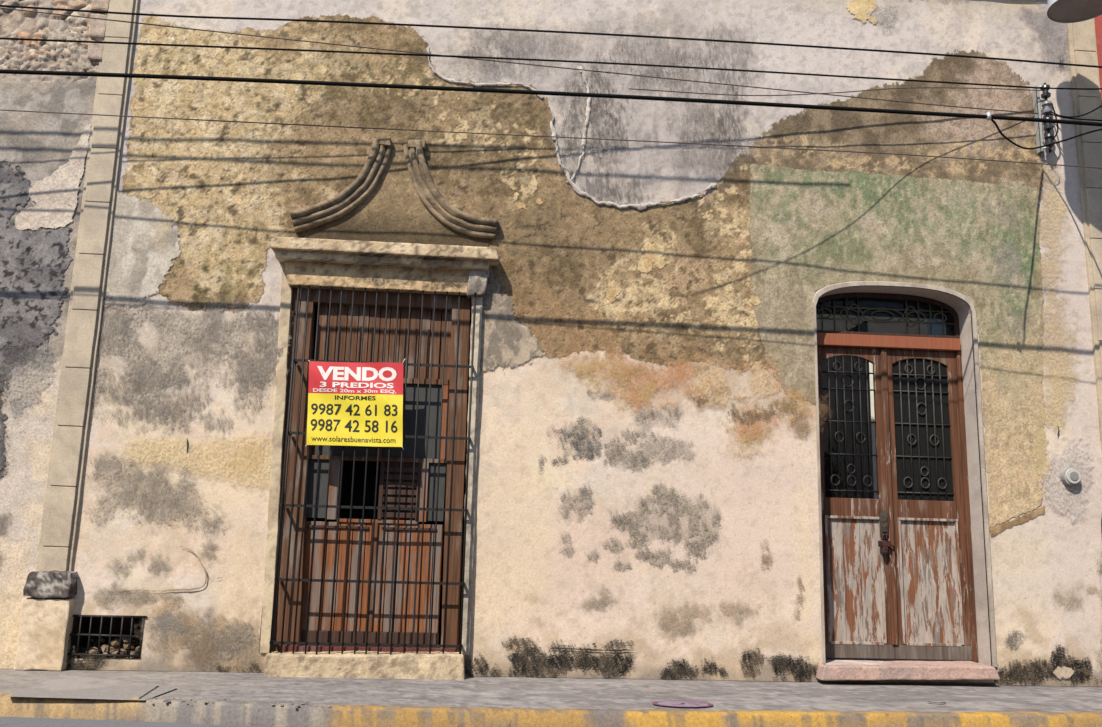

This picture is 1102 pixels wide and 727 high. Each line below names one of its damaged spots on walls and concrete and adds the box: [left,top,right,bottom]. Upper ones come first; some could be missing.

peeling [845,0,899,32]
flaking render [15,124,91,230]
peeling [513,175,542,210]
peeling [637,242,666,273]
water stain [91,290,291,437]
flaking render [479,265,546,401]
peeling [749,164,1080,536]
water stain [587,483,721,572]
water stain [464,636,635,678]
water stain [659,658,728,679]
water stain [739,647,818,682]
water stain [994,630,1102,686]